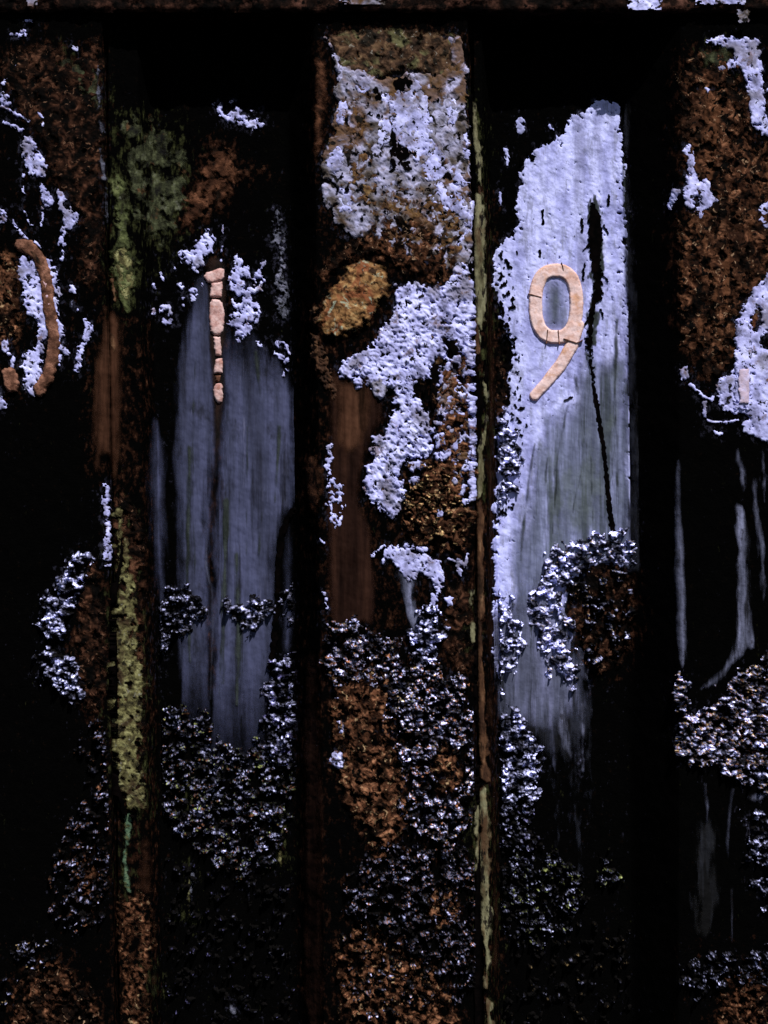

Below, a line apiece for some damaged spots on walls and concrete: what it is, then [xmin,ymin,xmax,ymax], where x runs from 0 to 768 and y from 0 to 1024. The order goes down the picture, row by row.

rust [0,253,21,344]
peeling [0,79,94,397]
rust [1,37,108,284]
peeling [151,210,290,378]
rust [307,97,481,623]
peeling [321,35,478,529]
peeling [491,100,631,678]
rust [673,50,768,382]
peeling [679,273,768,442]
peeling [705,35,768,137]
rust [328,659,408,863]
rust [333,928,460,1024]